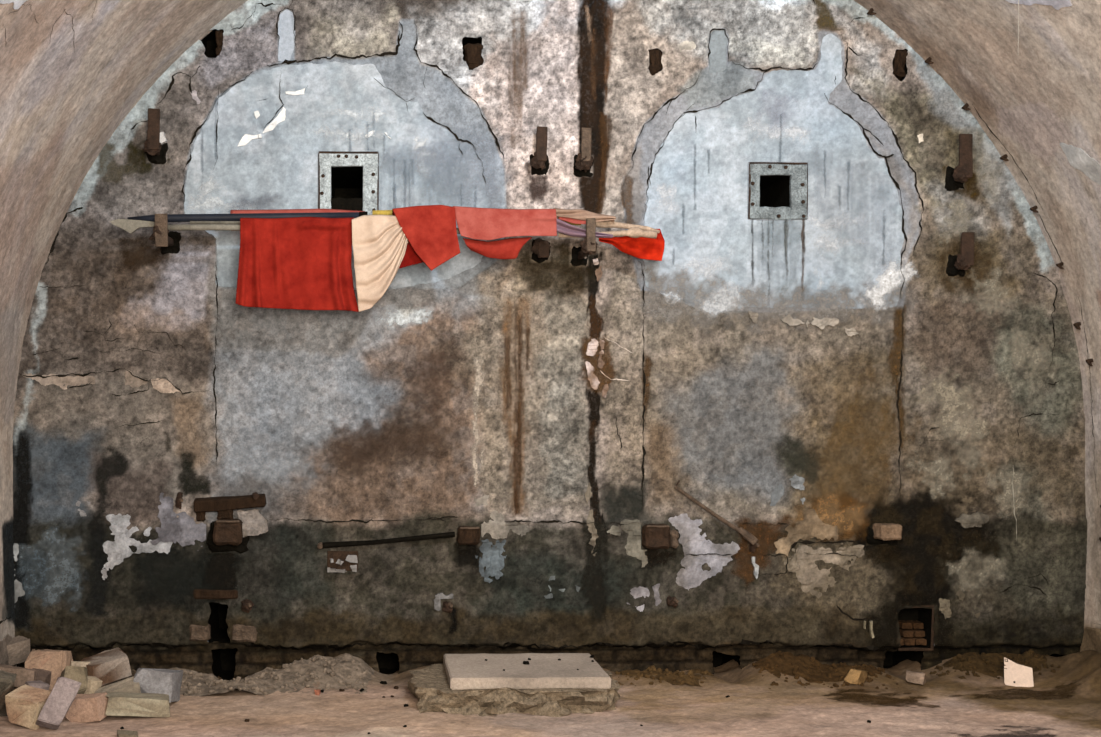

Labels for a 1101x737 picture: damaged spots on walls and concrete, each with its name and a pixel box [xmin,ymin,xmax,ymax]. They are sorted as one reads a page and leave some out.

crack [131,1,504,204]
corrosion [577,0,613,214]
corrosion [621,177,634,224]
crack [629,17,950,492]
damp [332,351,453,467]
corrosion [521,242,615,523]
crack [505,262,646,525]
damp [922,375,985,438]
peeling [101,514,173,580]
peeling [627,583,662,612]
peeling [668,513,740,591]
damp [853,460,1004,653]